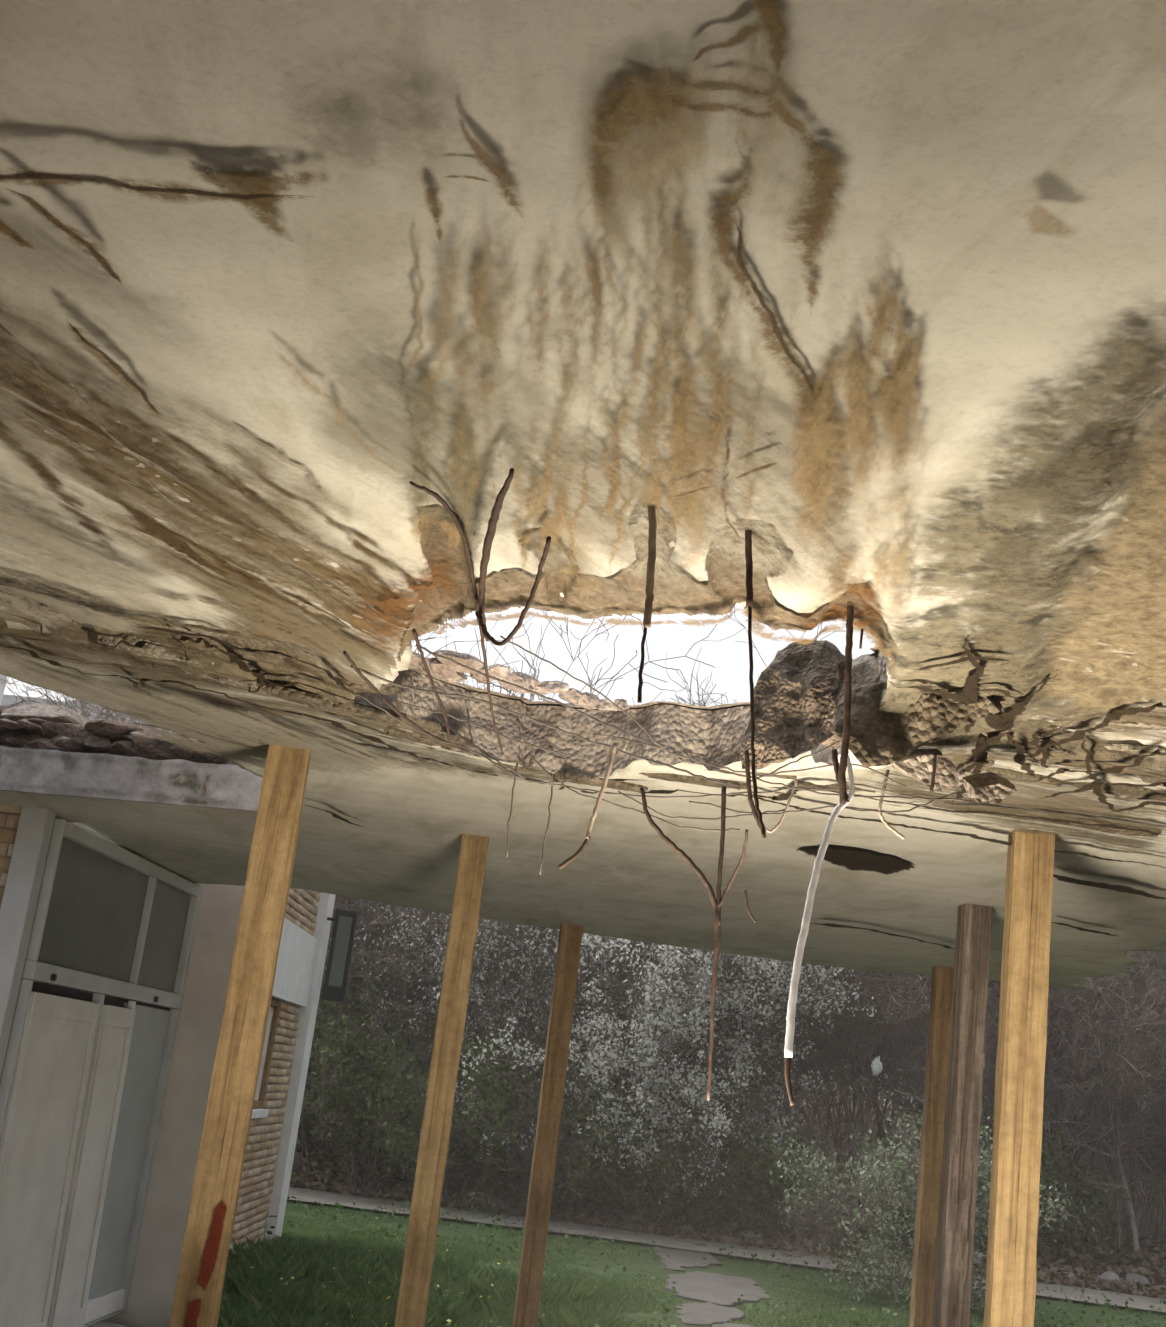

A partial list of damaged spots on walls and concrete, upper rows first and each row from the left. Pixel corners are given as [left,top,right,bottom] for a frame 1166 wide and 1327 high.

rust [692,0,787,72]
crack [0,170,302,282]
rust [448,110,520,212]
rust [592,80,845,307]
damp [0,308,420,716]
crack [0,590,511,779]
damp [0,659,553,782]
spalling [0,468,915,1101]
crack [640,639,1166,899]
damp [876,329,1166,779]
peeling [930,754,1161,836]
spalling [955,400,1166,801]